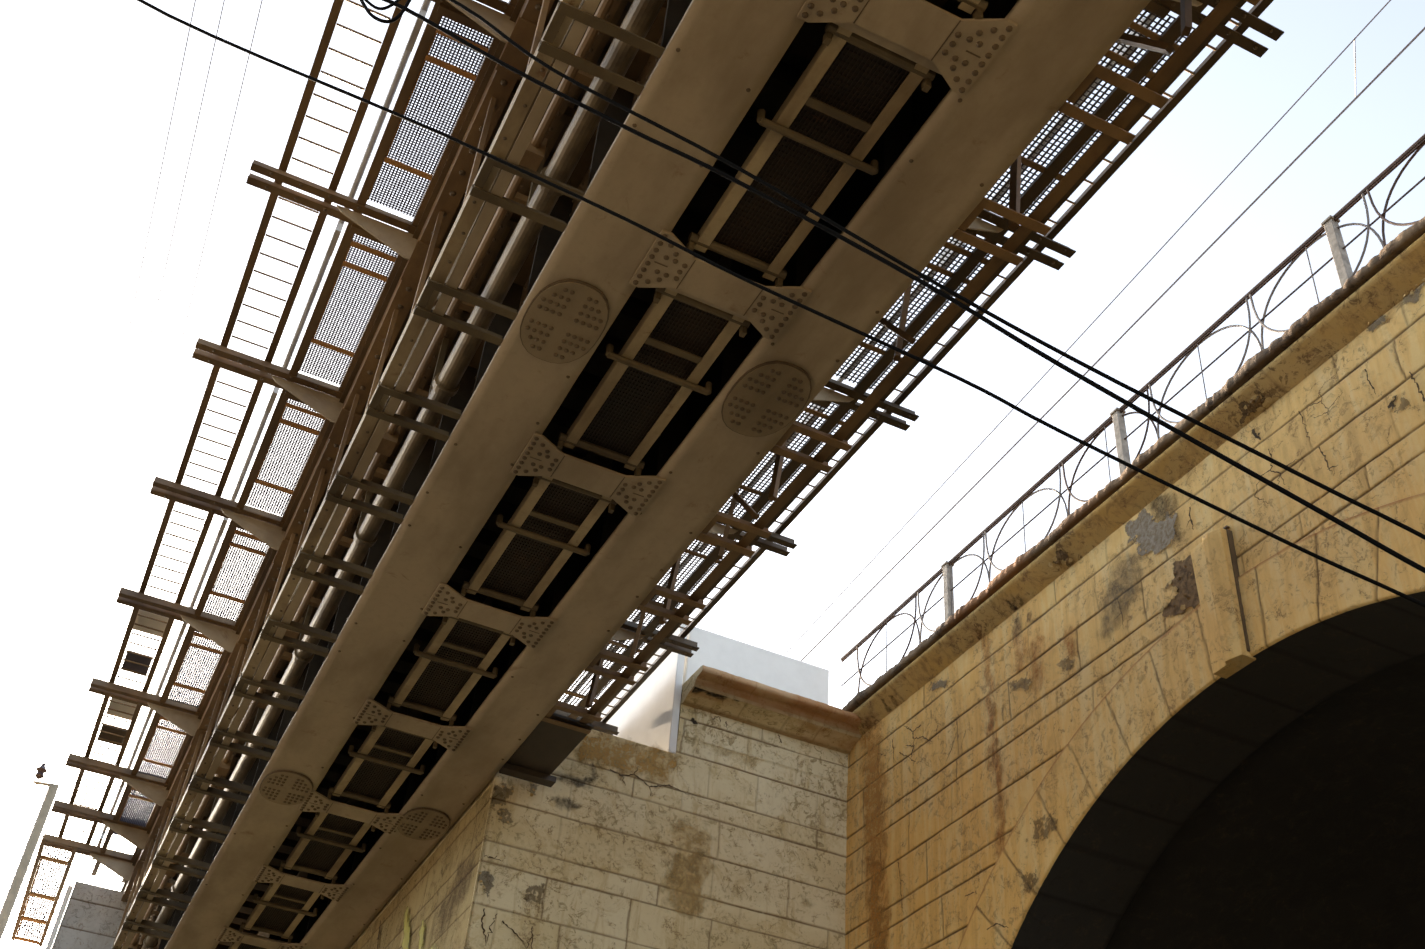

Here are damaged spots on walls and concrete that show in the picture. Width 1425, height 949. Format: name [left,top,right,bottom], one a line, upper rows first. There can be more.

peeling [1125,508,1200,617]
rust [862,716,889,949]
rust [976,629,1005,853]